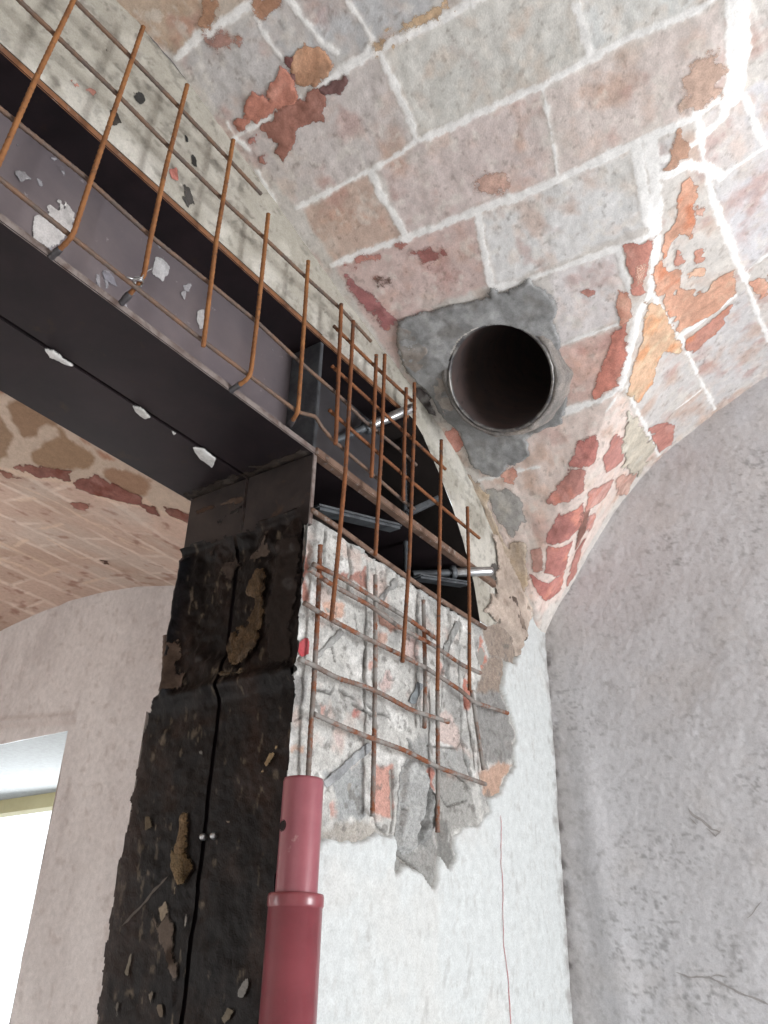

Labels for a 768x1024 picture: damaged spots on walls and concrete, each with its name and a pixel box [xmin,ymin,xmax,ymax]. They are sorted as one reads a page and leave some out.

peeling [592,177,736,403]
peeling [749,275,768,299]
flaking render [0,0,517,887]
flaking render [529,434,637,601]
peeling [648,422,675,453]